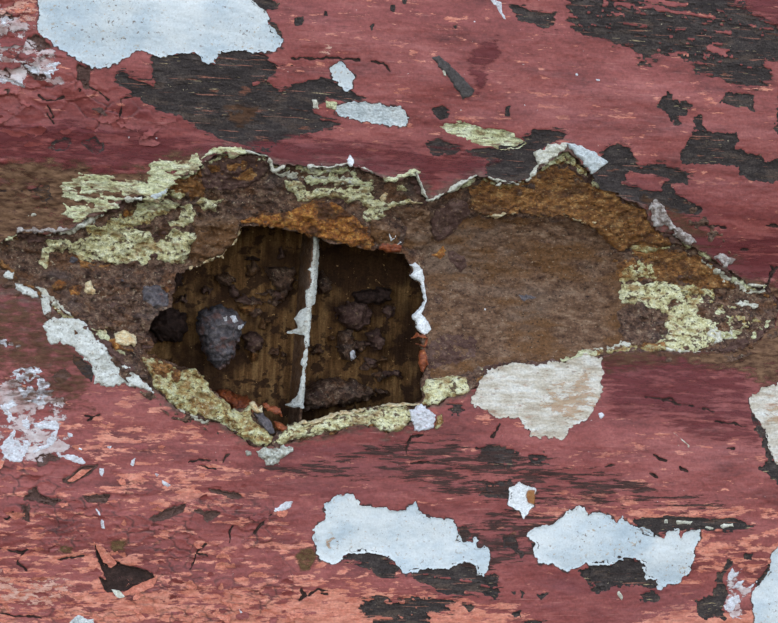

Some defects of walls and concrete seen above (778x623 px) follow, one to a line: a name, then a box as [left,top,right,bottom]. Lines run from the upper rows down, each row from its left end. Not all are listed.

crack [38,86,132,124]
peeling [0,0,409,155]
peeling [592,91,778,217]
peeling [446,353,604,440]
crack [0,612,42,620]
crack [0,548,85,572]
crack [190,543,208,569]
crack [253,514,272,535]
crack [298,588,328,601]
peeling [312,493,525,623]
peeling [502,506,756,603]
peeling [695,548,778,623]